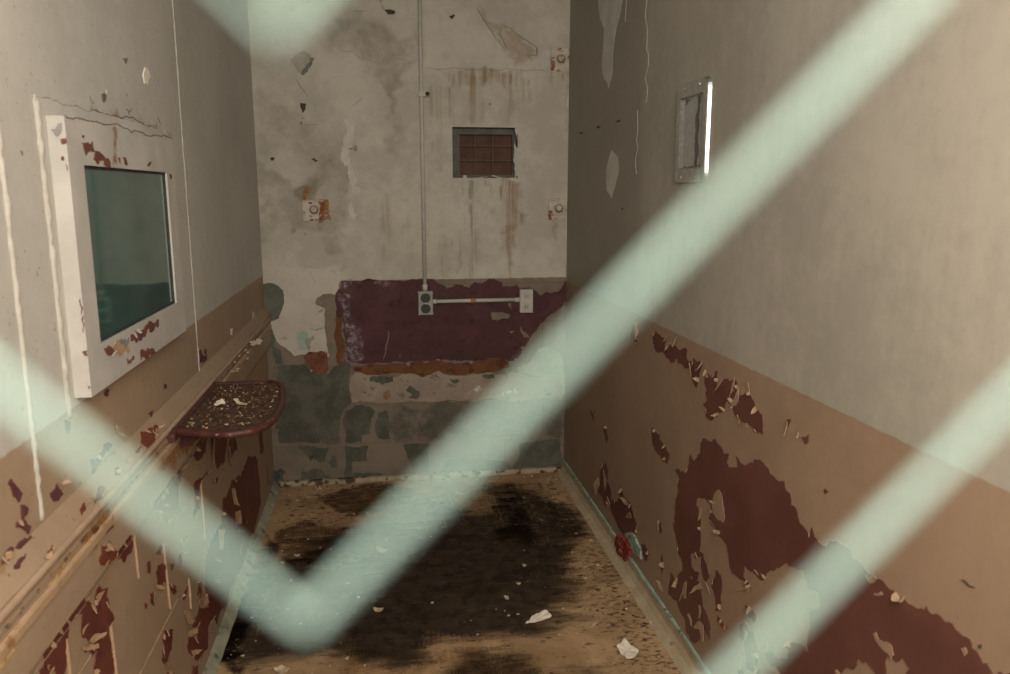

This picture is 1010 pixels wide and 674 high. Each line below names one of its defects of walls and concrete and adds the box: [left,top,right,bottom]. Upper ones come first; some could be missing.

crack [41,97,172,139]
rust [295,186,330,223]
peeling [104,319,160,364]
peeling [303,278,566,385]
peeling [649,331,763,435]
peeling [2,479,36,577]
peeling [39,584,115,674]
peeling [144,538,237,674]
peeling [160,432,271,564]
leakage [221,483,675,674]
peeling [651,427,846,649]
peeling [750,561,1010,674]